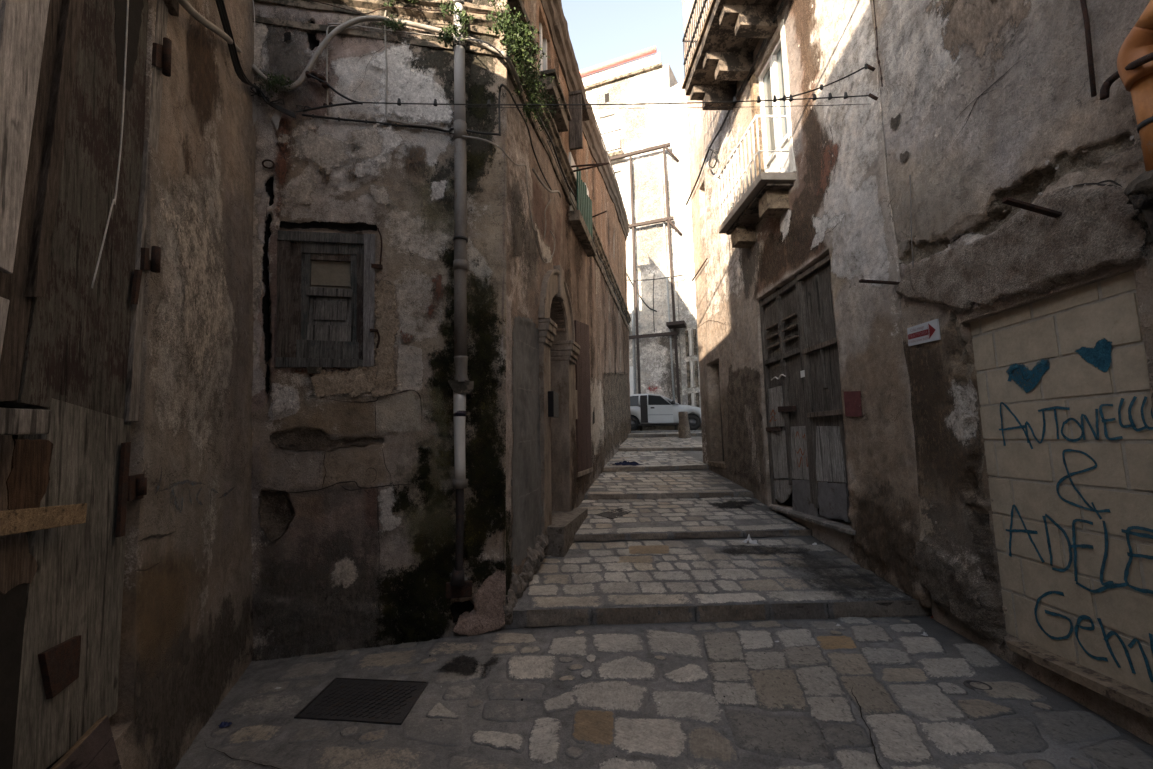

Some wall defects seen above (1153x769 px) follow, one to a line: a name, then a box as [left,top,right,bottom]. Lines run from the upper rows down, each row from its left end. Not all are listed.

peeling [253,22,268,84]
peeling [278,41,452,206]
peeling [157,192,228,391]
peeling [252,193,264,314]
flaking render [276,221,377,232]
flaking render [901,134,1135,266]
flaking render [269,387,384,451]
flaking render [258,491,295,542]